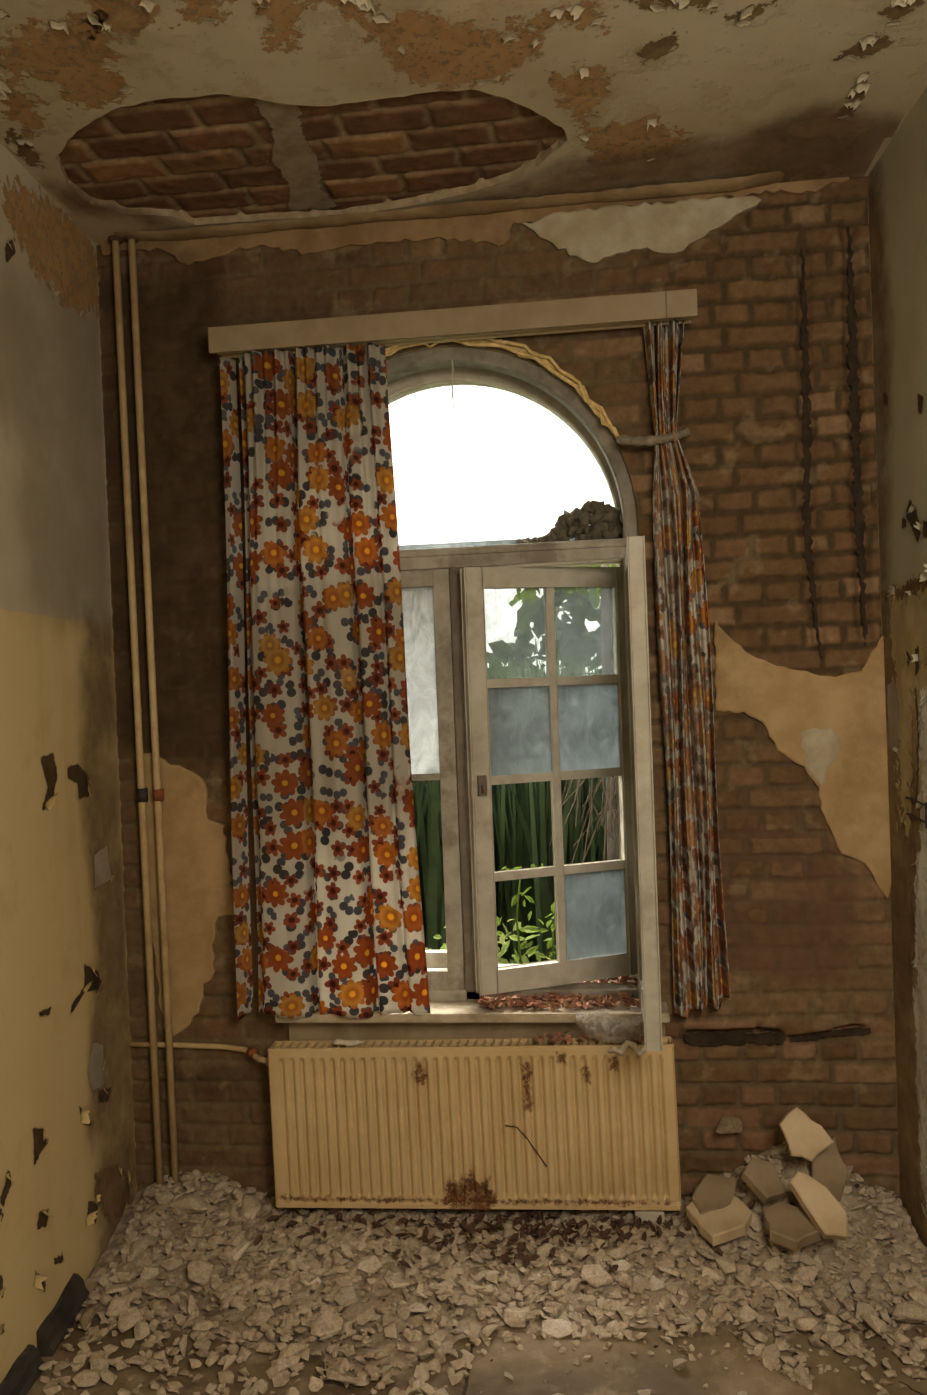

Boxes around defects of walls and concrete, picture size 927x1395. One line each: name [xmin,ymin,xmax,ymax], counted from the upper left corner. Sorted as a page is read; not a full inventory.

spalling [0,0,778,321]
damp [476,108,899,580]
peeling [40,753,91,811]
peeling [881,564,927,1222]
peeling [71,964,103,1013]
peeling [79,1042,112,1127]
peeling [33,1128,49,1165]
peeling [0,1171,15,1229]
peeling [37,1209,53,1229]
peeling [85,1163,132,1229]